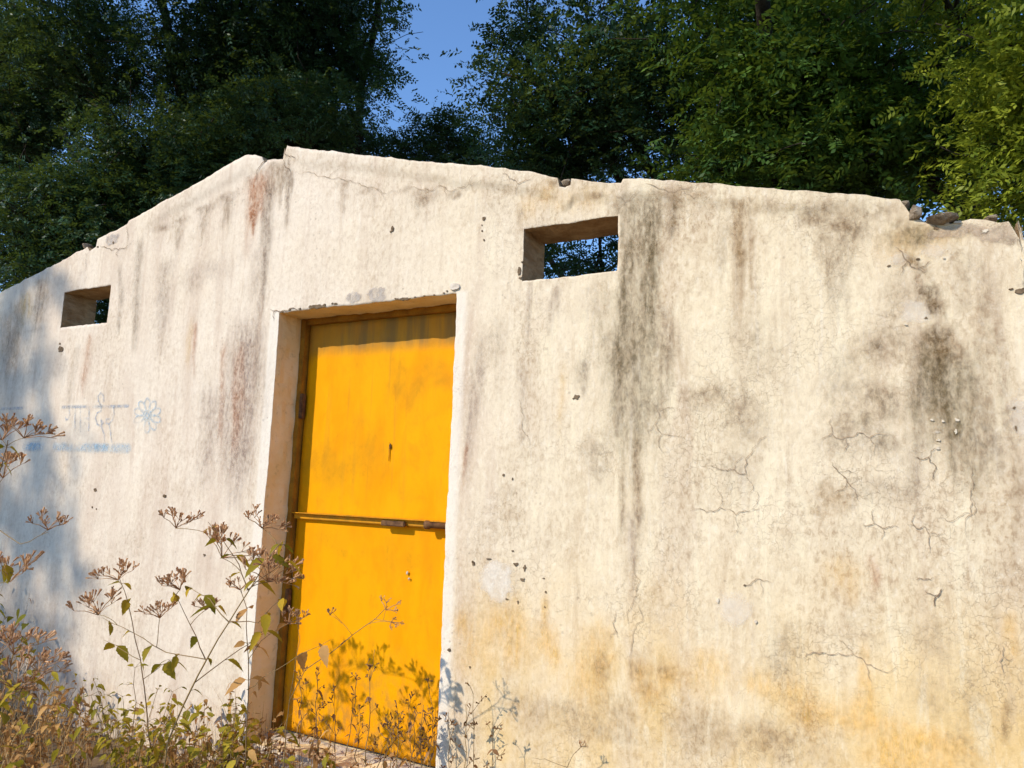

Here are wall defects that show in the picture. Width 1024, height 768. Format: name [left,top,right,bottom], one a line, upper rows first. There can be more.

water stain [921,331,962,436]
crack [697,436,765,532]
crack [824,418,976,605]
crack [793,642,905,682]